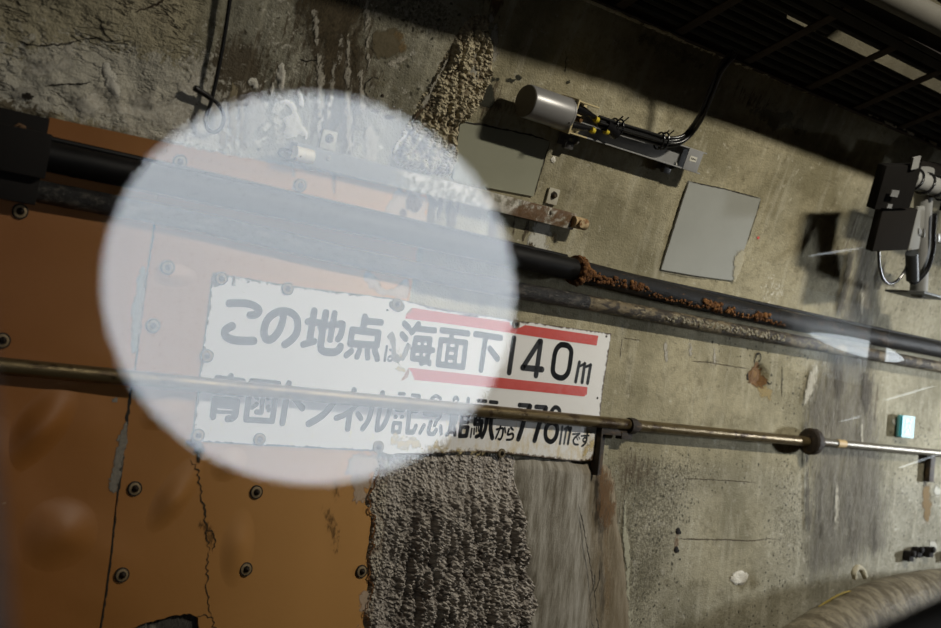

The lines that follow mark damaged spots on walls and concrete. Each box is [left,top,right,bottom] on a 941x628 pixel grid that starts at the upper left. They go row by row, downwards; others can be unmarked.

crack [18,18,119,47]
crack [136,0,164,12]
crack [46,81,92,89]
leakage [218,0,408,162]
leakage [392,13,499,177]
corrosion [574,255,785,327]
peeling [109,422,128,493]
peeling [345,452,379,503]
crack [191,461,217,628]
corrosion [597,467,616,617]